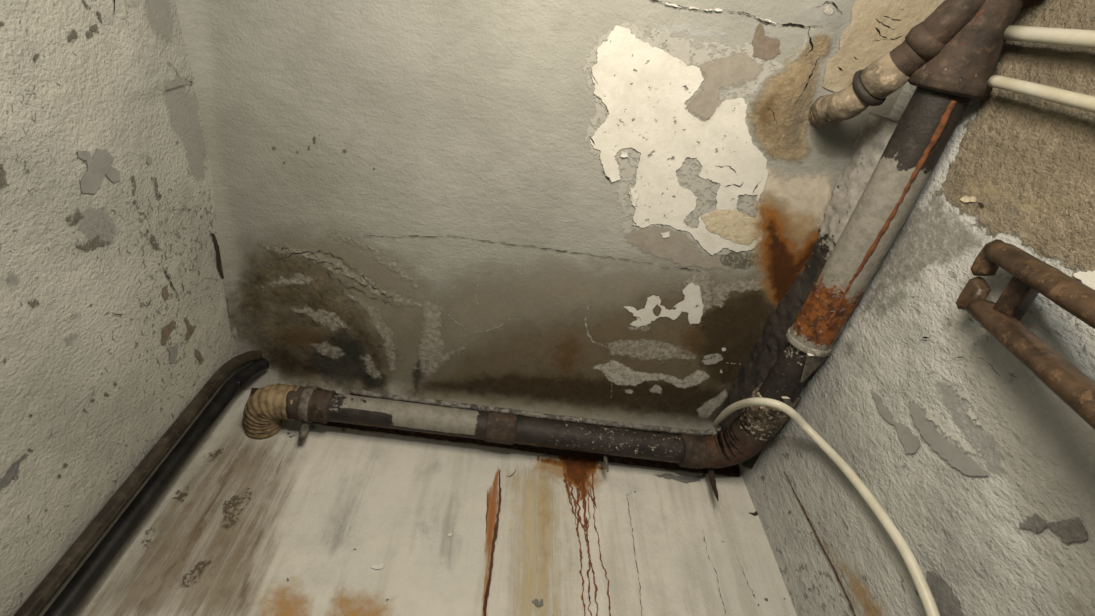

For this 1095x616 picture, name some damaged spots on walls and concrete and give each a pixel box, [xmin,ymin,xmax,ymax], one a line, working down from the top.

crack [652,0,822,57]
flaking render [805,0,945,93]
spalling [993,40,1095,96]
spalling [1014,0,1095,30]
peeling [583,22,782,271]
spalling [935,88,1095,280]
corrosion [759,199,819,303]
water stain [230,237,777,424]
corrosion [311,421,740,616]